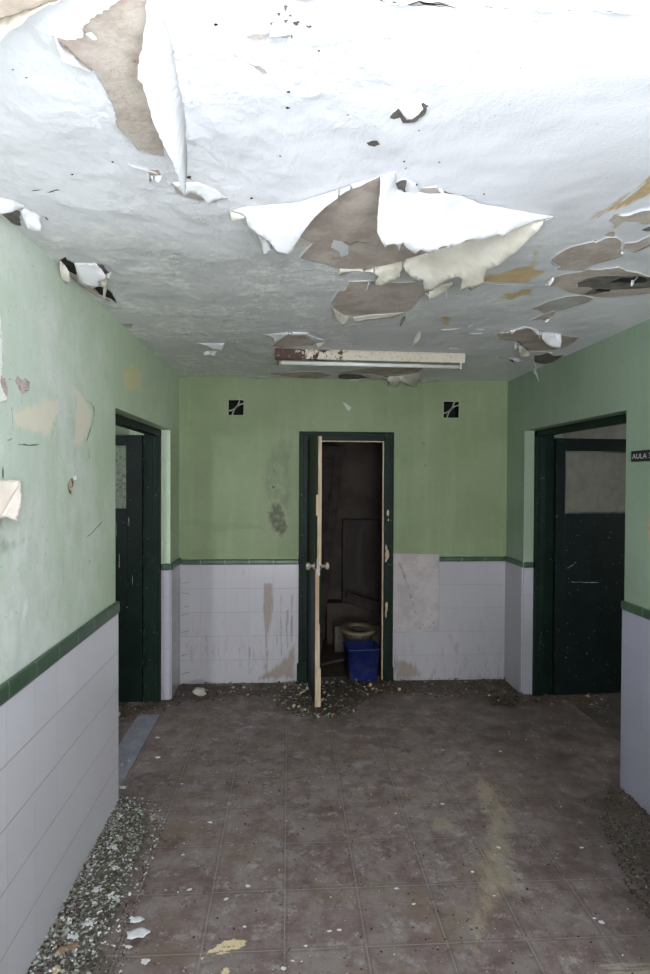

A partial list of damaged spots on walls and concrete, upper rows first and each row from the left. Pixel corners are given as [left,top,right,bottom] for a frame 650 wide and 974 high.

peeling [0,0,66,41]
peeling [247,5,312,39]
crack [380,0,650,15]
peeling [48,0,228,205]
peeling [389,99,432,124]
peeling [0,198,48,231]
water stain [583,166,650,224]
peeling [229,161,554,326]
peeling [59,257,117,303]
peeling [497,207,650,381]
peeling [0,314,62,446]